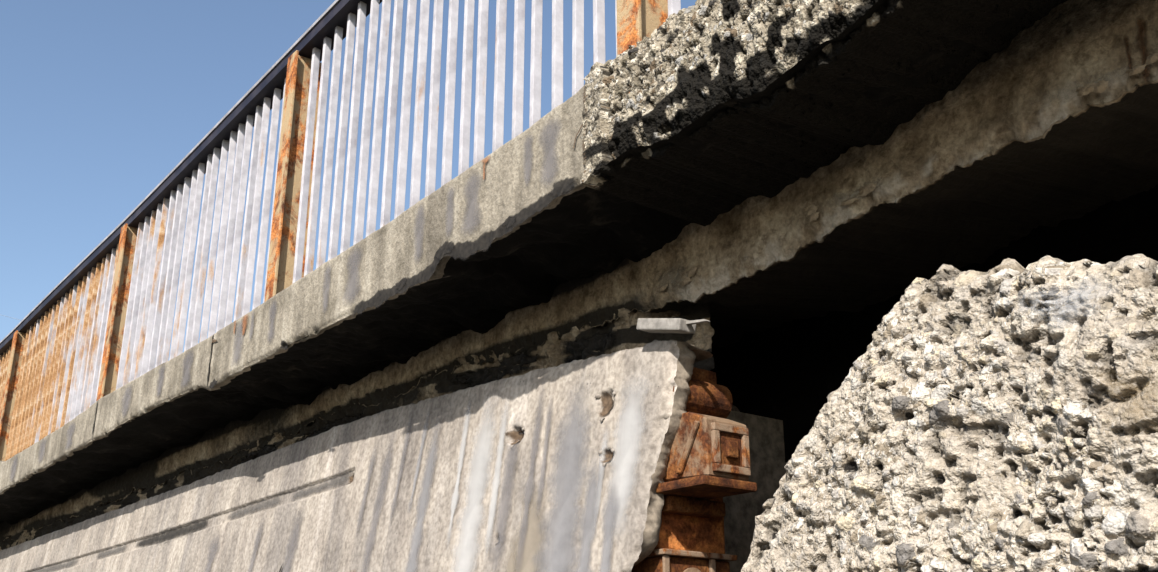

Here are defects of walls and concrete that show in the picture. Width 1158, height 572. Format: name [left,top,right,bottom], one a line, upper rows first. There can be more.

peeling [1125,52,1158,76]
spalling [580,0,1067,226]
water stain [563,332,616,363]
water stain [453,350,545,389]
water stain [294,414,363,443]
water stain [239,444,276,462]
water stain [359,425,435,572]
water stain [450,397,641,572]
crack [1140,564,1158,572]